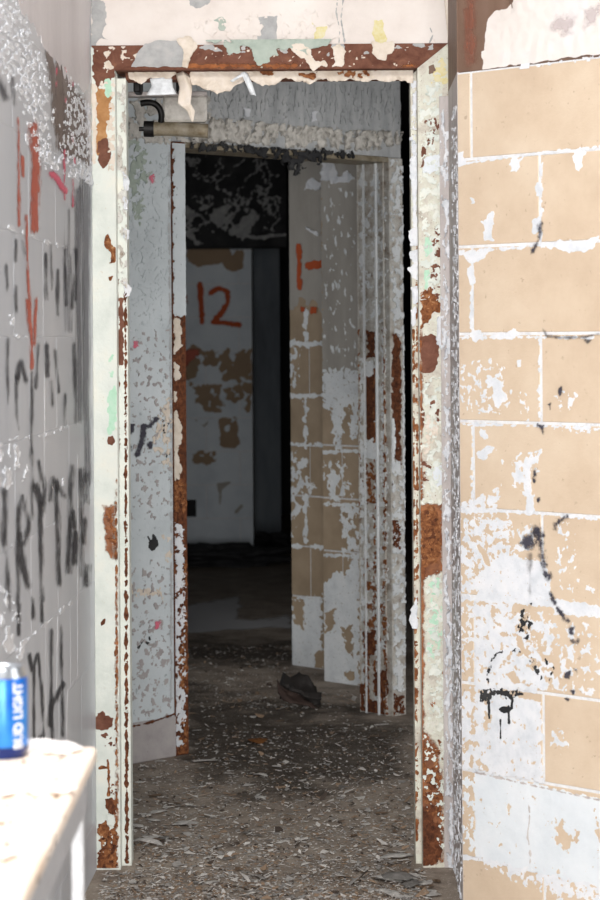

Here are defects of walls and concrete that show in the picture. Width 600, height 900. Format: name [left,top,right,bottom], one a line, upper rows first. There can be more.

rust [92,46,138,87]
peeling [349,20,401,67]
peeling [481,0,600,70]
rust [97,138,111,168]
rust [421,118,439,167]
rust [104,234,116,263]
peeling [411,286,430,327]
peeling [130,329,183,520]
rust [96,276,130,868]
peeling [291,450,418,692]
rust [357,228,444,866]
peeling [131,513,188,747]